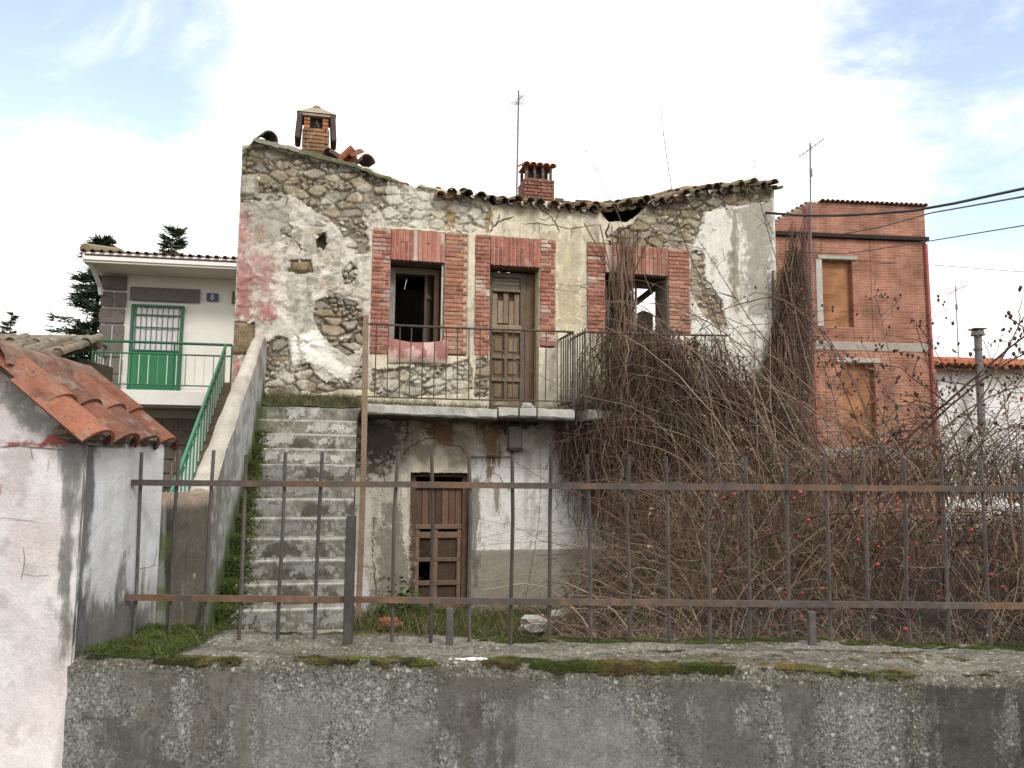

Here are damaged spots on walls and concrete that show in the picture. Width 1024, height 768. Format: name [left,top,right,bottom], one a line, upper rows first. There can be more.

spalling [240,146,493,284]
spalling [606,189,775,330]
damp [728,207,740,313]
peeling [5,424,82,447]
damp [0,385,153,659]
spalling [248,294,490,628]
peeling [228,612,277,629]